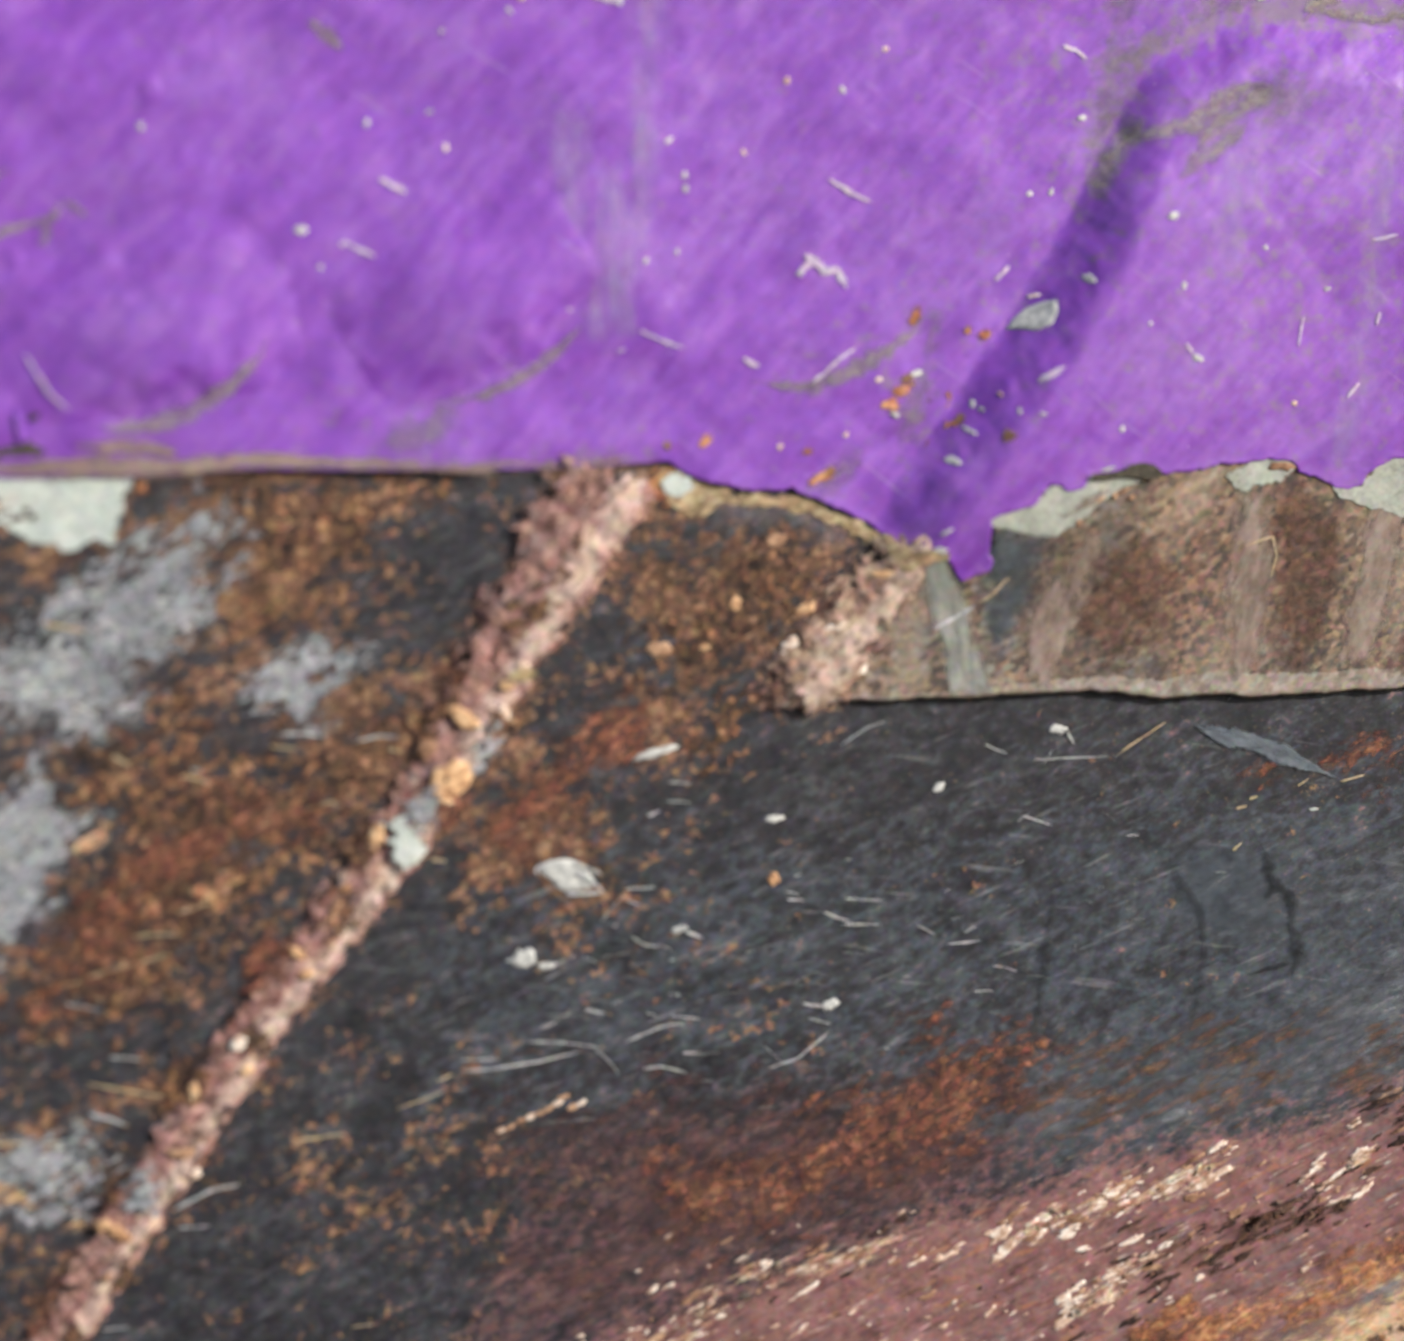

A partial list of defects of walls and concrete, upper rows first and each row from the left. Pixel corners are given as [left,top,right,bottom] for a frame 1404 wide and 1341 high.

peeling [661,470,954,573]
peeling [992,462,1163,538]
rust [988,536,1176,685]
peeling [1226,459,1297,492]
peeling [1332,458,1404,662]
peeling [237,631,378,738]
rust [0,467,606,1119]
peeling [380,776,449,870]
crack [1261,858,1303,973]
rust [67,1158,135,1230]
rust [499,1002,1310,1324]
rust [98,1243,155,1292]